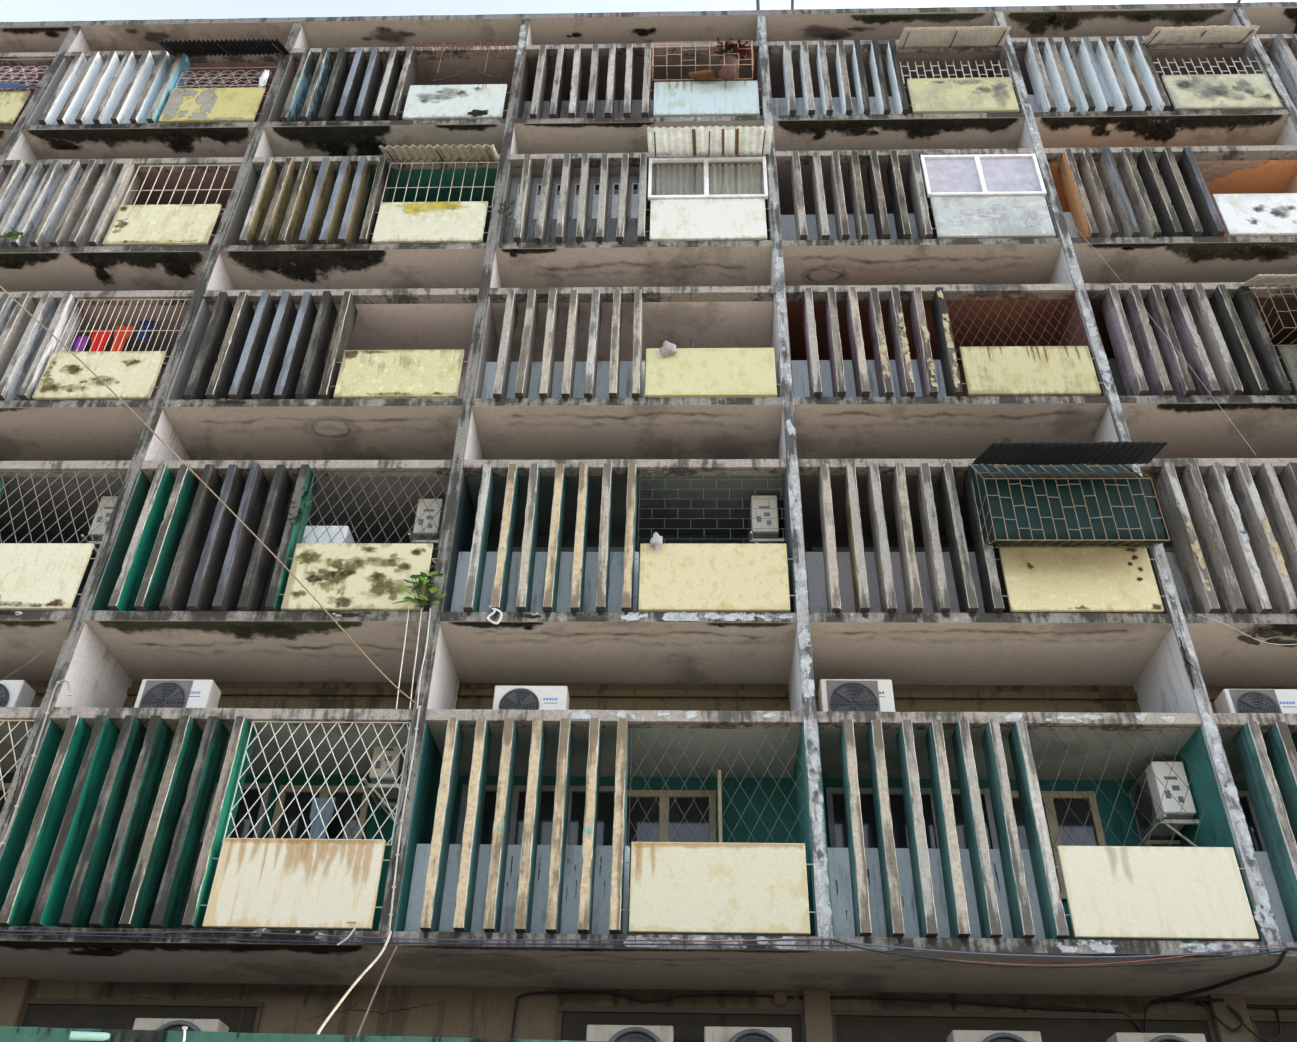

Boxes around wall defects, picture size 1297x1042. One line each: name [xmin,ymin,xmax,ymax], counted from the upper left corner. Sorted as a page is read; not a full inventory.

water stain [1284,8,1297,34]
water stain [28,122,249,153]
water stain [0,206,203,284]
water stain [228,244,386,283]
water stain [1088,242,1297,263]
peeling [877,290,960,388]
peeling [789,473,803,534]
water stain [0,595,63,627]
water stain [97,547,425,649]
peeling [795,566,808,605]
peeling [806,730,832,936]